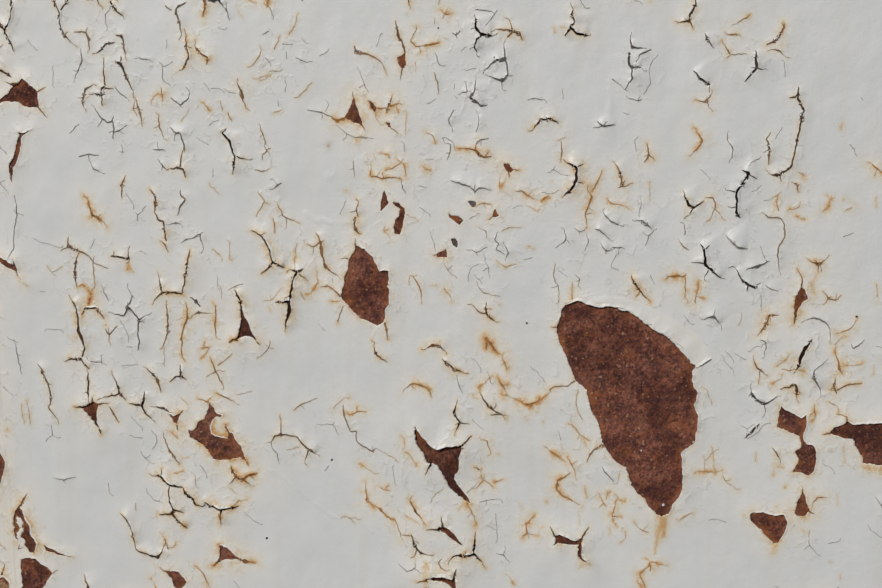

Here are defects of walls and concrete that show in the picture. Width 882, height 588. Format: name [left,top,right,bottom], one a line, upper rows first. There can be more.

crack [565,0,590,37]
crack [594,32,657,128]
crack [693,71,713,112]
crack [675,0,789,81]
crack [0,0,523,559]
peeling [322,243,392,340]
crack [318,86,882,583]
peeling [413,424,474,505]
peeling [550,296,713,516]
peeling [777,404,818,476]
peeling [823,414,882,465]
peeling [13,494,74,588]